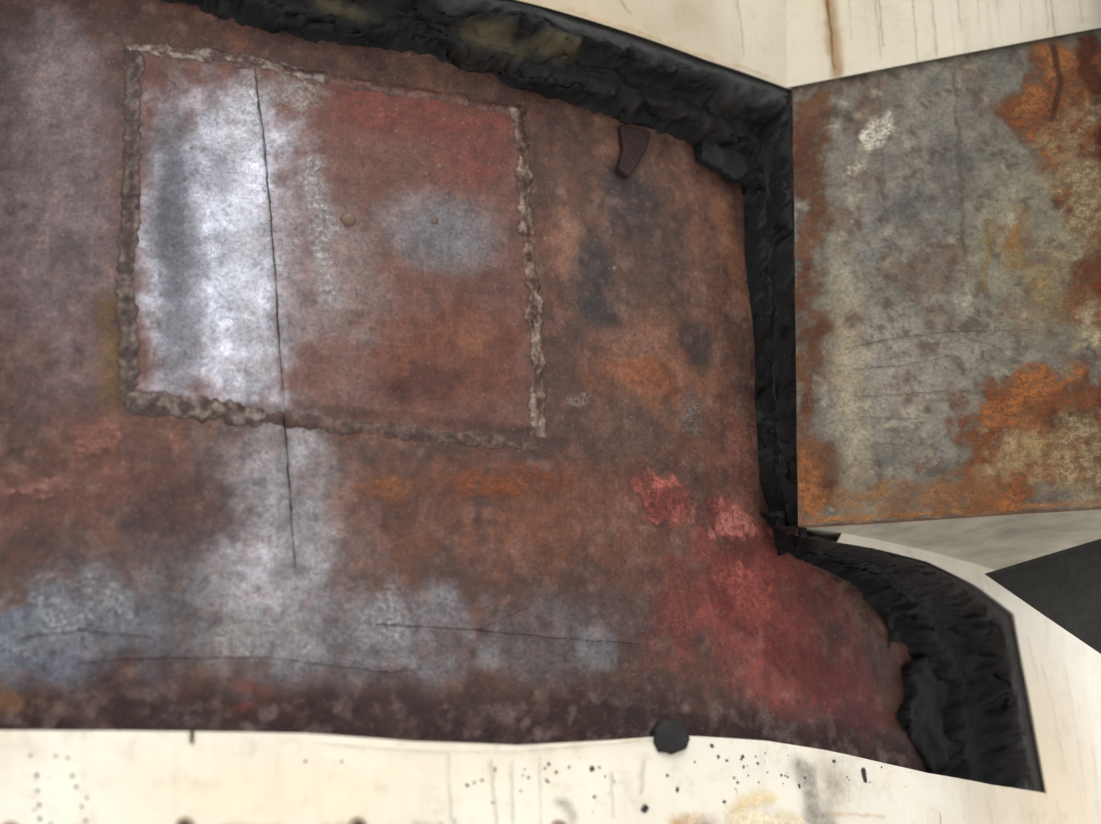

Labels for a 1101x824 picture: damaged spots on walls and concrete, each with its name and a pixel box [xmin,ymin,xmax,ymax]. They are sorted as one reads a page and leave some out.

crack [256,77,283,386]
rust [793,87,1101,524]
rust [998,34,1101,345]
crack [283,416,296,566]